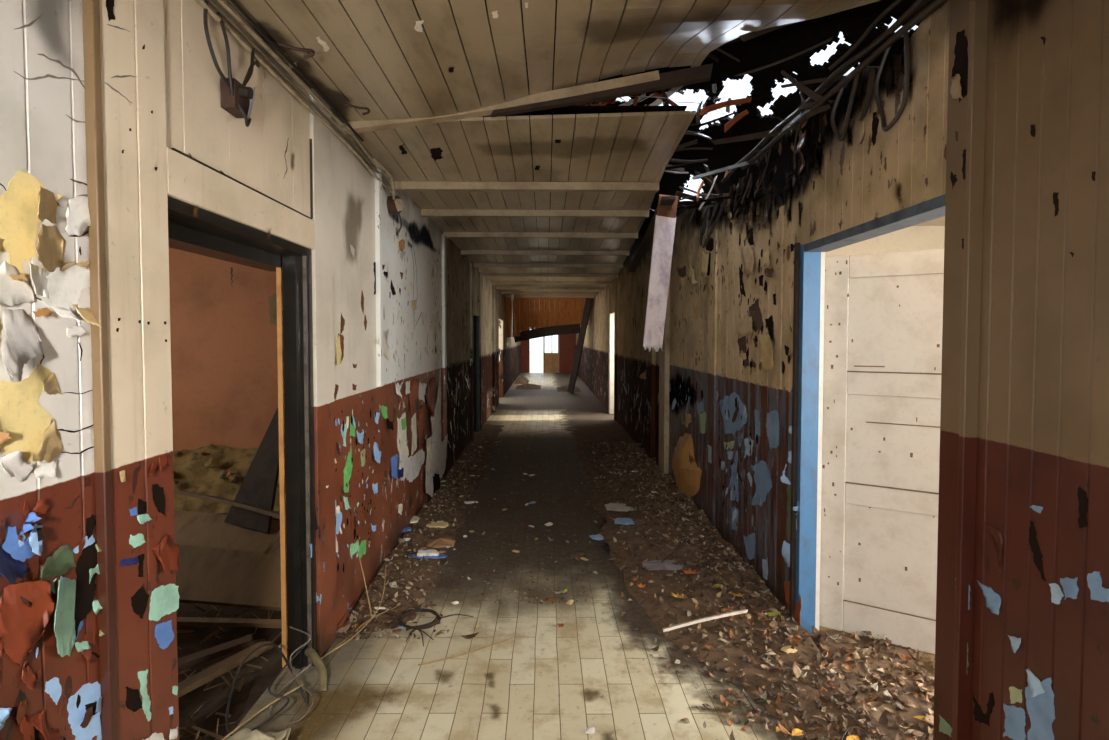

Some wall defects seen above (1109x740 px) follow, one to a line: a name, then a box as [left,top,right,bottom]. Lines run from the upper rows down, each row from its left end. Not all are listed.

crack [15,16,41,29]
crack [14,54,137,104]
leakage [689,36,914,234]
spalling [670,111,828,374]
peeling [0,498,105,740]
crack [57,424,94,454]
peeling [126,669,151,721]
peeling [120,453,180,649]
spalling [334,239,470,572]
peeling [697,391,799,580]
peeling [972,668,1055,740]
peeling [1029,505,1109,604]